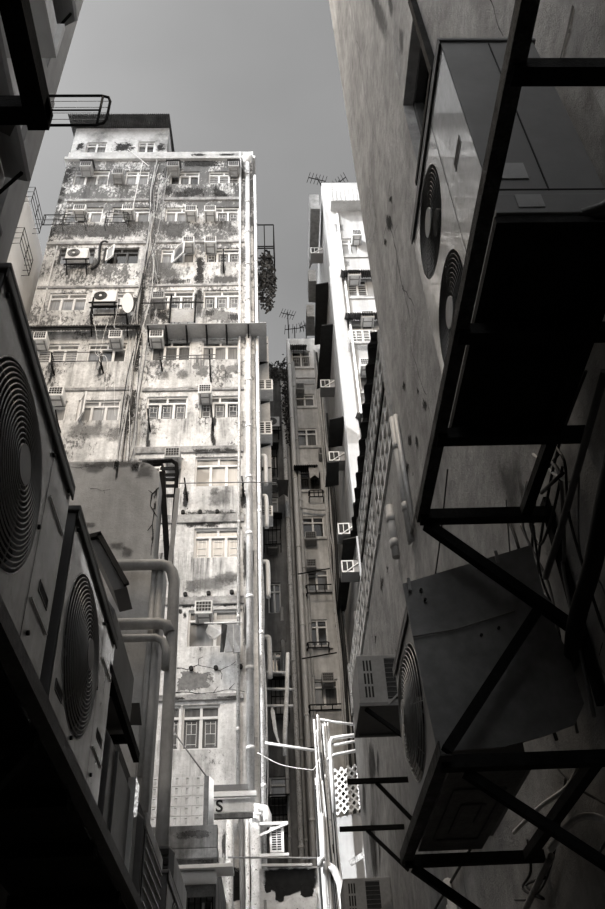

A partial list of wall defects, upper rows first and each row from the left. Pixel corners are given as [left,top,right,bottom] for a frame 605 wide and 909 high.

damp [162,166,231,197]
damp [182,153,238,167]
damp [49,208,141,241]
damp [163,223,183,238]
damp [104,273,146,324]
damp [194,256,239,317]
damp [133,332,142,375]
damp [68,385,136,440]